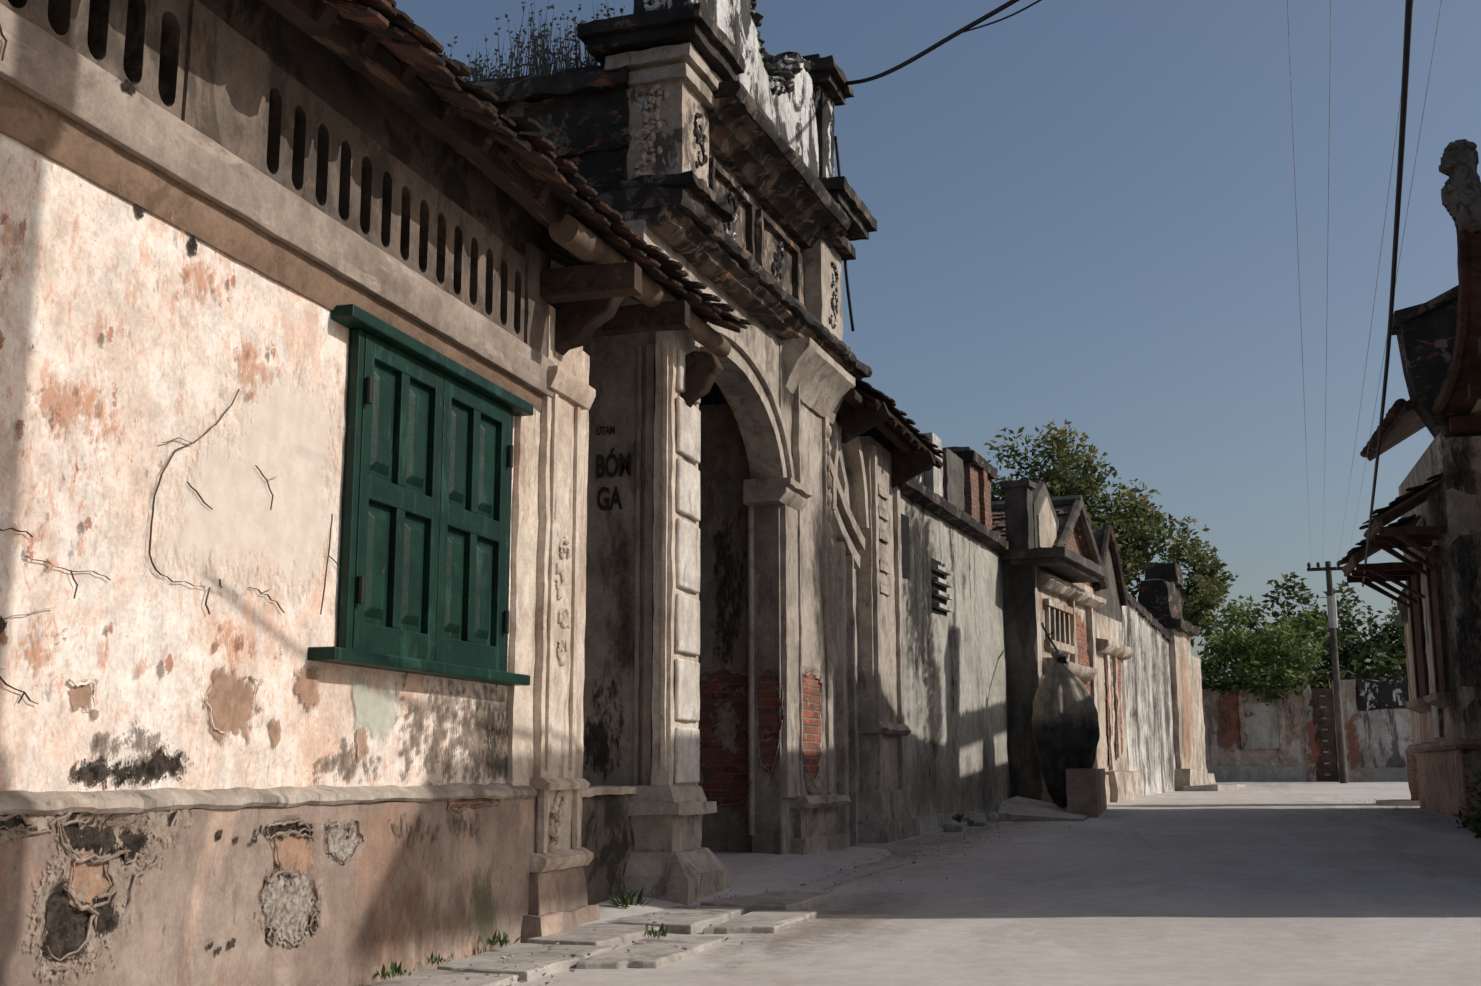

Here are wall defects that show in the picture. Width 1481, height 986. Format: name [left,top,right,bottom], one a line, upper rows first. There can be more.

crack [0,668,38,704]
crack [0,528,111,619]
spalling [0,614,194,986]
crack [148,389,285,614]
spalling [202,579,281,750]
spalling [216,818,366,948]
crack [320,514,340,615]
peeling [306,673,508,850]
water stain [477,696,508,781]
flaking render [698,668,784,807]
water stain [900,496,968,790]
water stain [1434,429,1481,739]